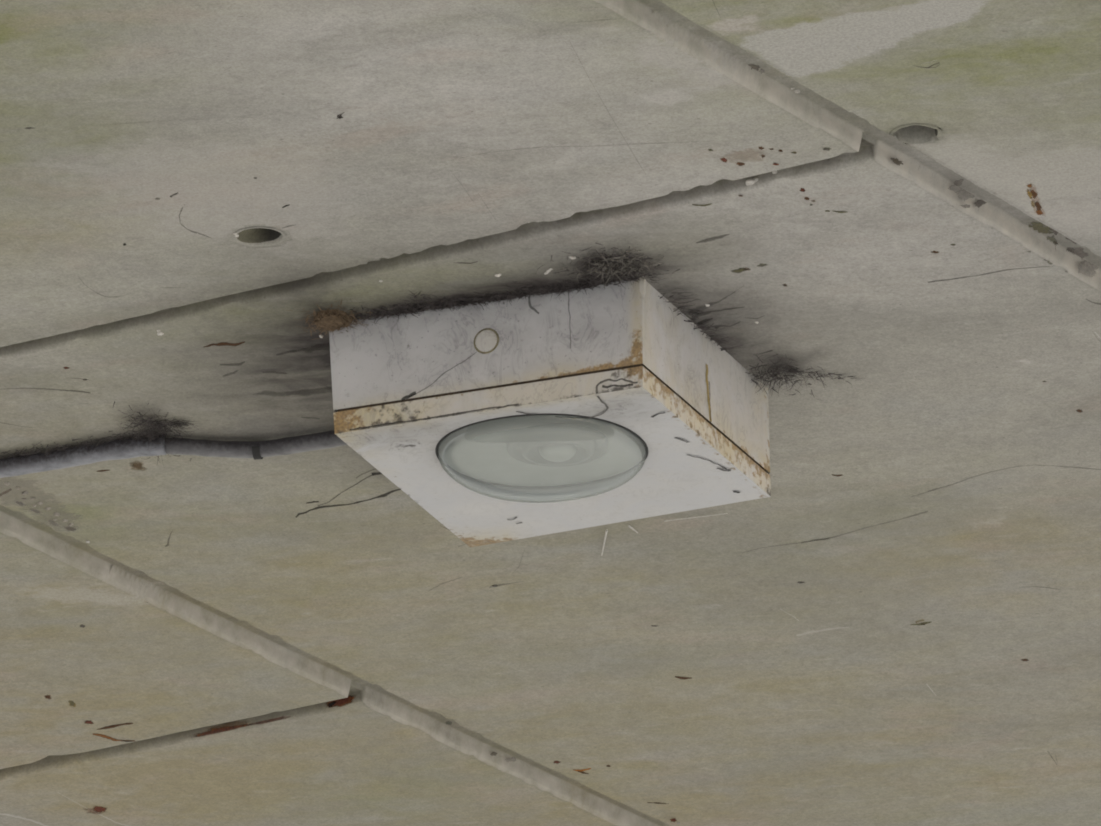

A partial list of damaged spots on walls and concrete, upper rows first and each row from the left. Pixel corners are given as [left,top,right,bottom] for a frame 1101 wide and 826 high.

damp [567,0,1036,113]
corrosion [1027,184,1043,215]
crack [296,472,401,517]
corrosion [326,696,354,708]
corrosion [195,716,291,737]